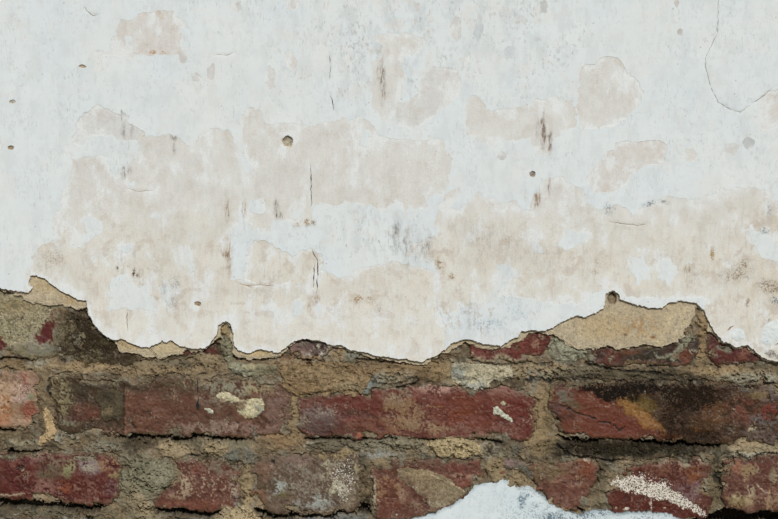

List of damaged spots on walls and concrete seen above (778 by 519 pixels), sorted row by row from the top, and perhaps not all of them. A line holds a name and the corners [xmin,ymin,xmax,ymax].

peeling [93,10,187,63]
crack [705,0,766,112]
peeling [0,33,778,397]
spalling [38,407,57,447]
spalling [216,392,265,419]
spalling [493,401,514,422]
spalling [427,436,483,459]
spalling [131,459,175,495]
spalling [396,466,466,509]
spalling [225,505,261,519]